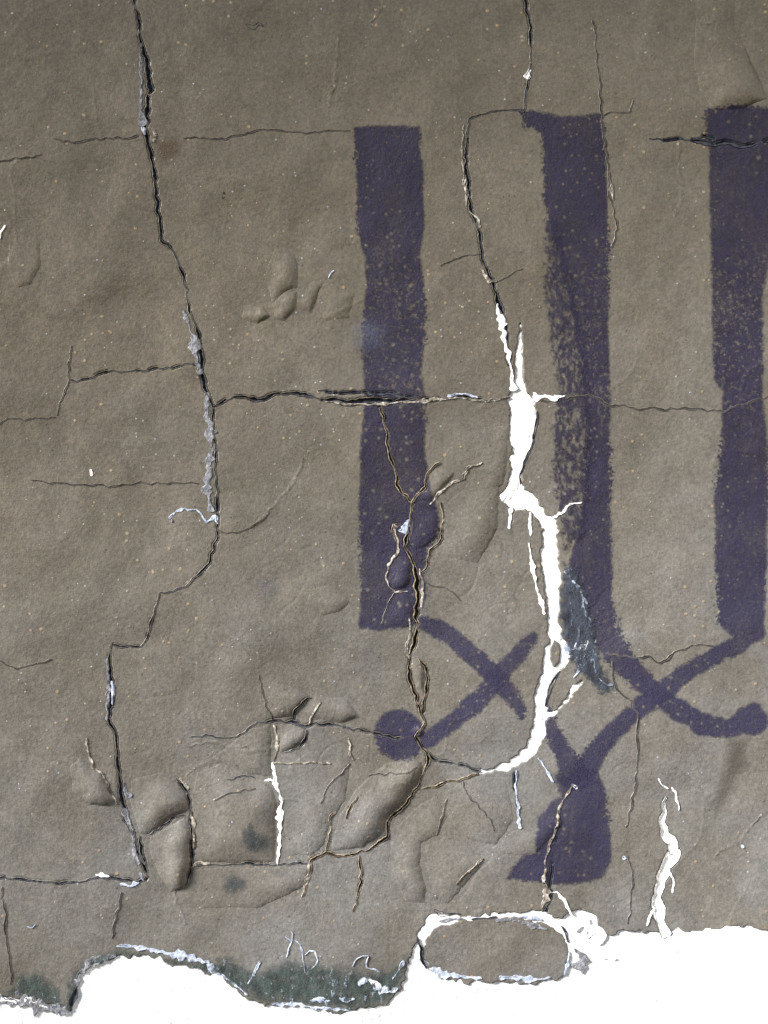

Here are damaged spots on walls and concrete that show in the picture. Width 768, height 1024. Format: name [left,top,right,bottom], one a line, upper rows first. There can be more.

crack [591,20,634,248]
crack [649,135,768,155]
crack [0,0,533,985]
spalling [478,324,588,774]
crack [532,392,768,413]
crack [538,758,578,915]
crack [605,644,712,938]
spalling [0,909,768,1024]